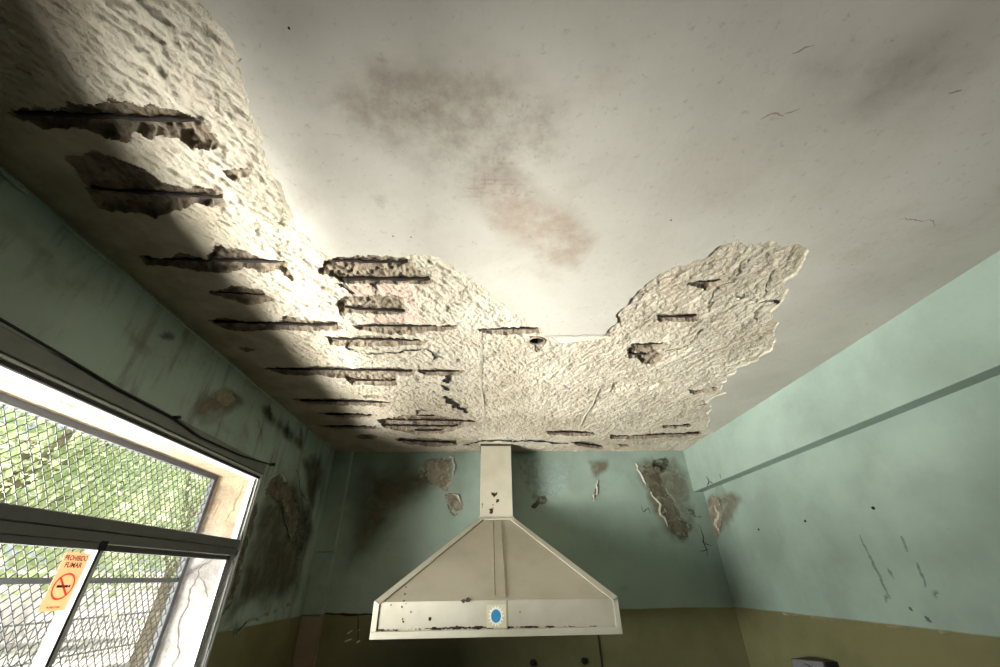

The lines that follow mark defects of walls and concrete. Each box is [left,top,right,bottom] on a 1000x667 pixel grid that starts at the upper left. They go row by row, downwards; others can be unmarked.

spalling [0,0,807,516]
water stain [232,460,321,612]
peeling [635,464,691,540]